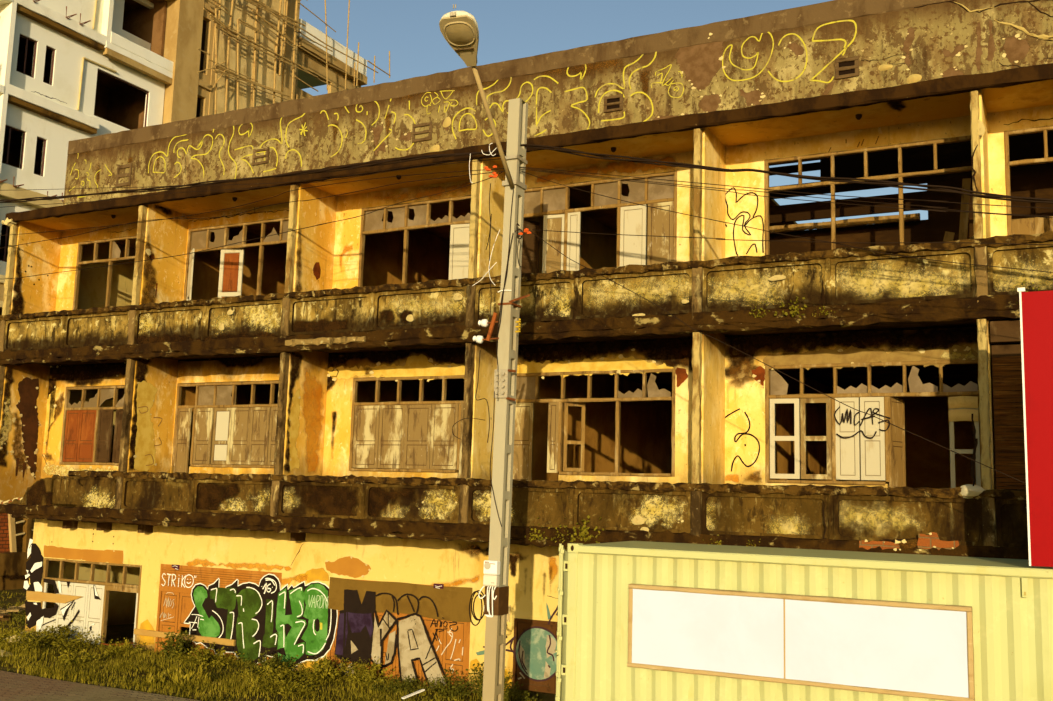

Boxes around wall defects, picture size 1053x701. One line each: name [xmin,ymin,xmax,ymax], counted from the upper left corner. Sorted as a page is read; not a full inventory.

flaking render [674,33,726,113]
flaking render [784,42,804,57]
flaking render [940,43,968,77]
crack [914,0,1053,67]
leakage [10,247,24,315]
leakage [841,264,963,298]
leakage [380,298,463,329]
flaking render [0,377,117,479]
leakage [84,488,115,508]
leakage [197,483,270,511]
leakage [631,495,684,526]
flaking render [859,532,959,551]